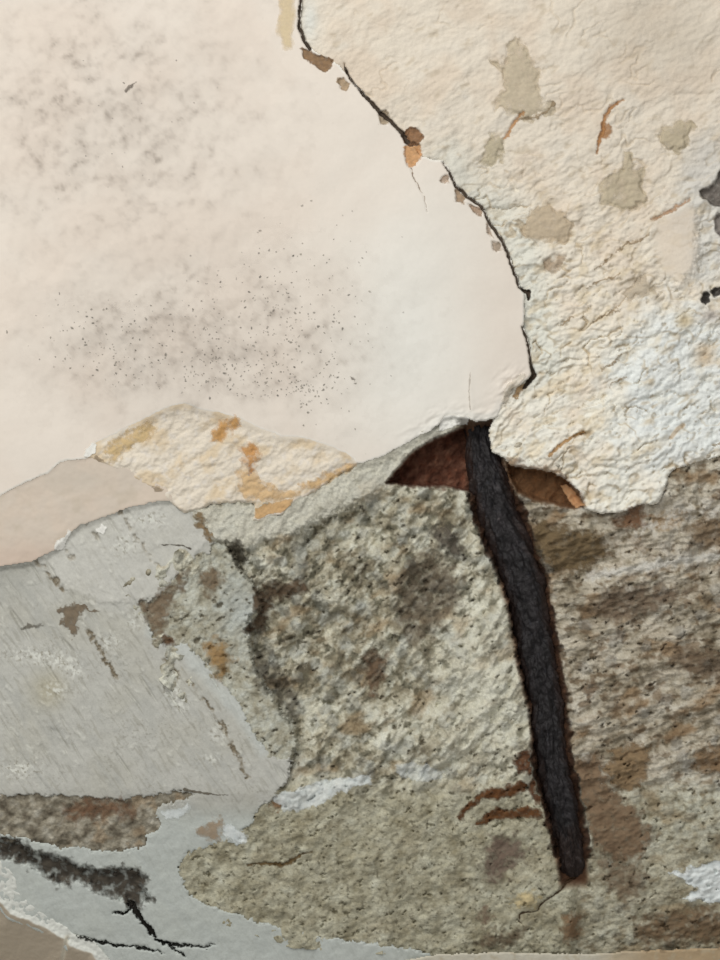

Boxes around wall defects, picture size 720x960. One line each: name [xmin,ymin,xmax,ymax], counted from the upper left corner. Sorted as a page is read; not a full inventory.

leakage [279,0,294,47]
crack [297,0,531,301]
crack [503,101,556,139]
peeling [300,0,720,514]
crack [513,327,537,399]
crack [548,431,585,457]
corrosion [467,492,496,562]
spalling [0,403,720,956]
corrosion [457,746,561,858]
crack [0,837,213,956]